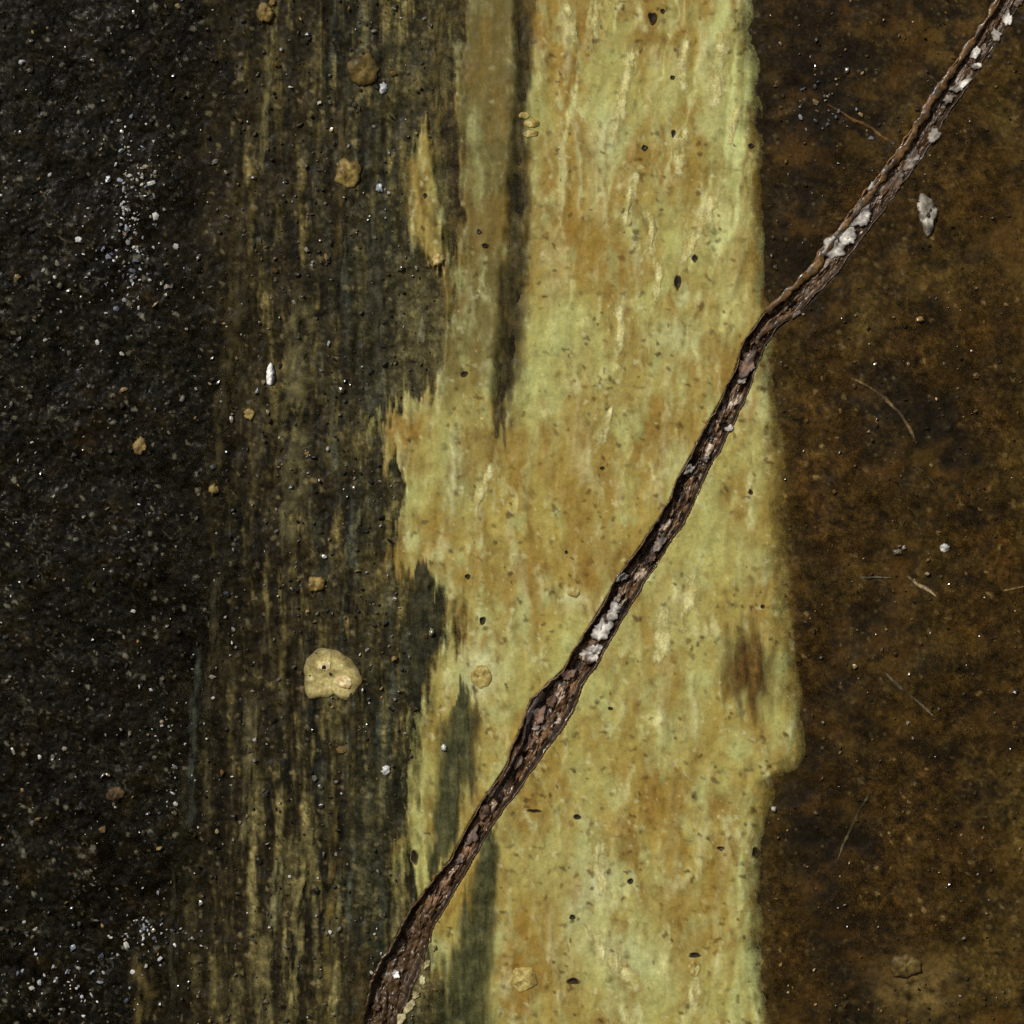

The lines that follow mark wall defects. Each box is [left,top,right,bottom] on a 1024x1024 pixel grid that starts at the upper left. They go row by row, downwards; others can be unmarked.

water stain [258,27,276,172]
water stain [279,303,317,548]
water stain [370,0,765,899]
crack [359,0,1024,1024]
water stain [240,699,258,848]
water stain [253,825,317,1024]
water stain [316,685,359,1024]
water stain [422,850,480,1009]
water stain [483,354,800,1024]